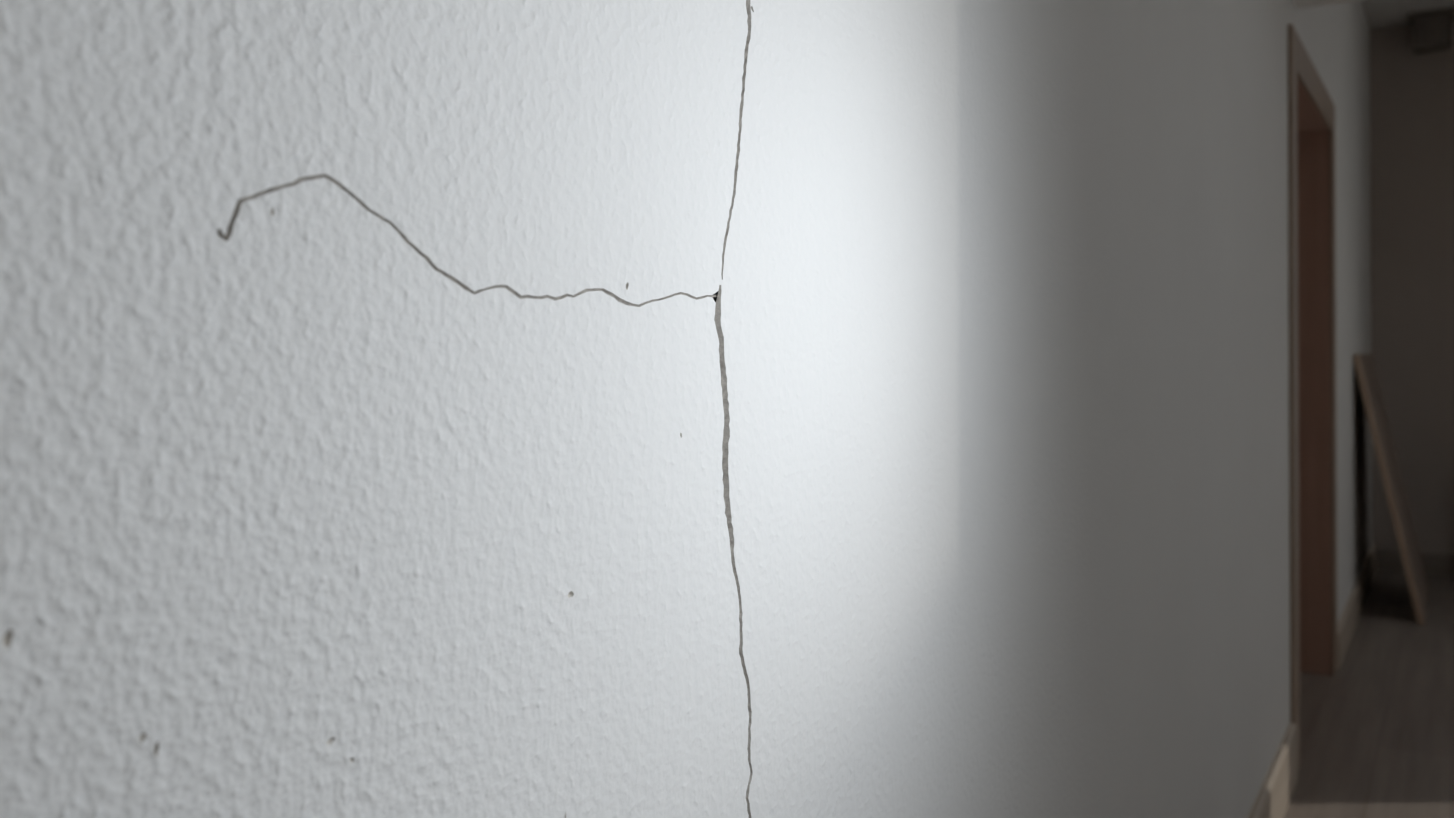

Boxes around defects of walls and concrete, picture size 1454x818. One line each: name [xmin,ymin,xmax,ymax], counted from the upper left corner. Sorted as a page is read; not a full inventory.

crack [217,0,754,818]